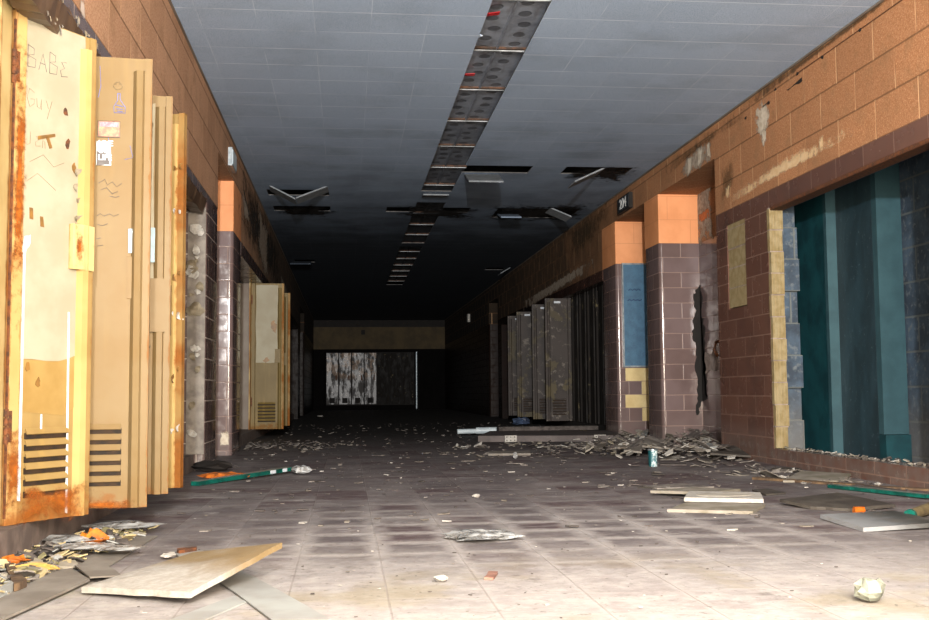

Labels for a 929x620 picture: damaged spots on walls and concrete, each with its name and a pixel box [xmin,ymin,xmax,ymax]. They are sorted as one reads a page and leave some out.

rust [13,101,26,265]
peeling [681,143,711,177]
peeling [697,187,713,245]
spalling [727,218,747,308]
spalling [692,285,718,415]
rust [6,431,78,519]